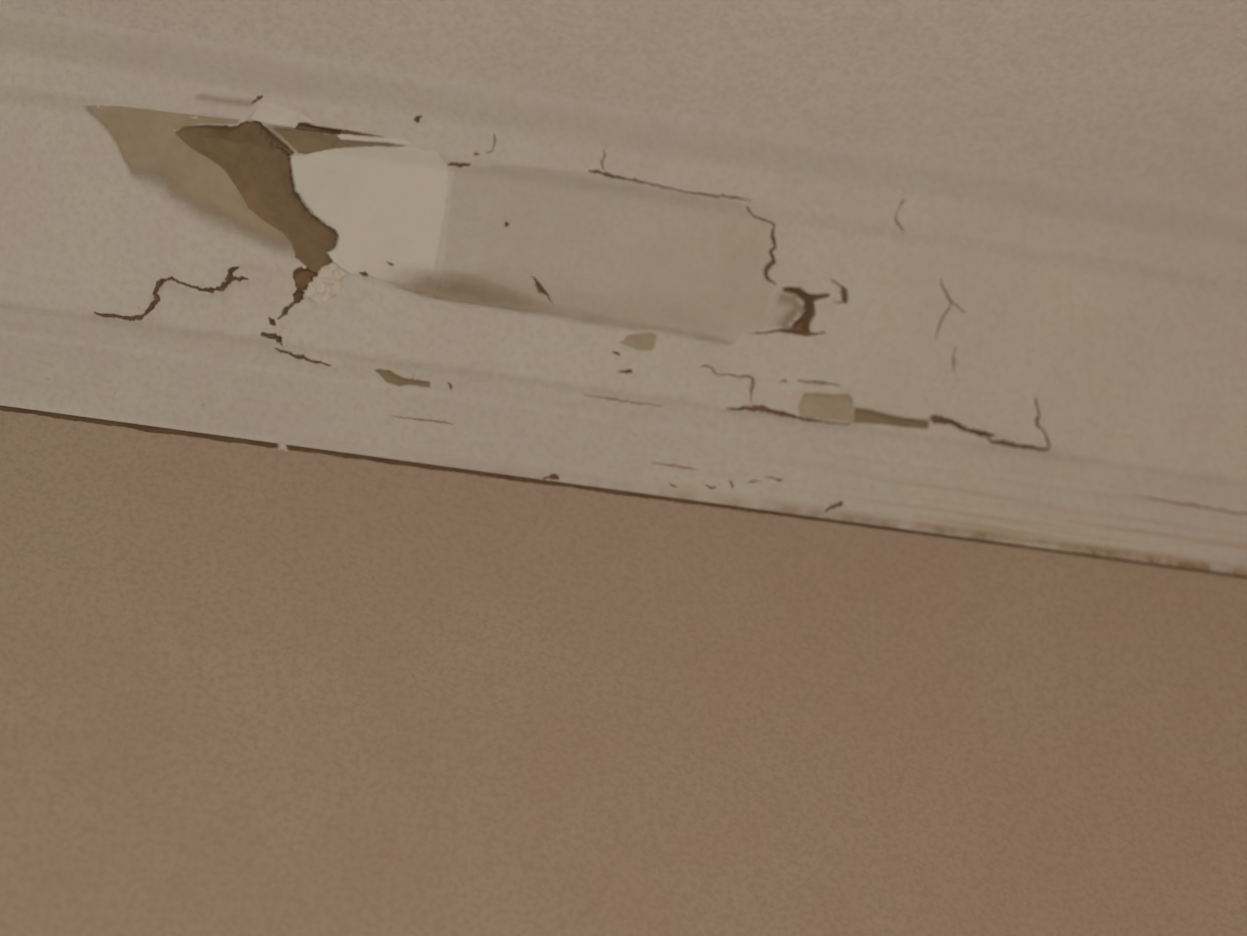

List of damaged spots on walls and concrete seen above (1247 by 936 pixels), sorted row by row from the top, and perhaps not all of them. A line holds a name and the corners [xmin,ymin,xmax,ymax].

peeling [87,101,448,305]
crack [589,149,777,285]
crack [94,267,248,321]
crack [260,266,331,366]
crack [831,279,848,304]
crack [936,279,965,373]
peeling [375,369,430,388]
crack [700,365,851,425]
peeling [797,393,928,429]
crack [930,395,1050,451]